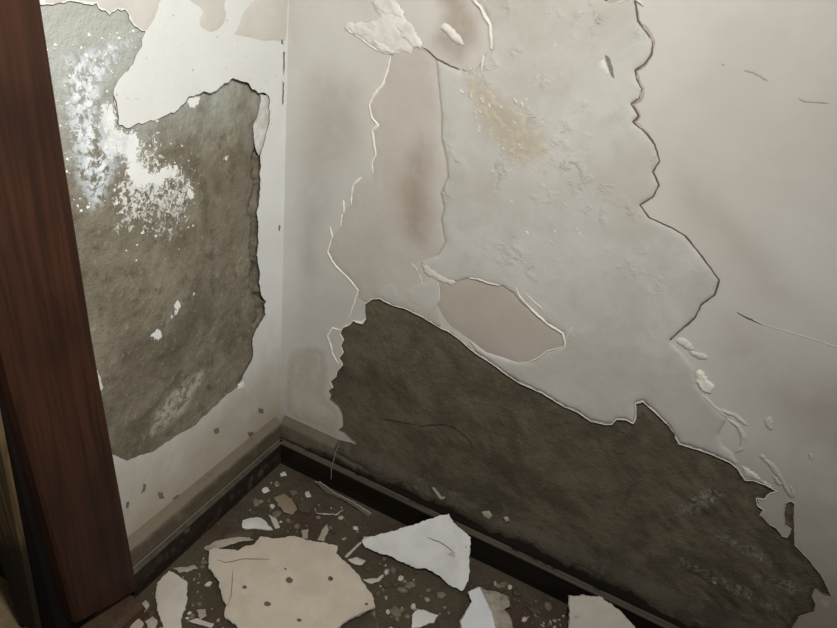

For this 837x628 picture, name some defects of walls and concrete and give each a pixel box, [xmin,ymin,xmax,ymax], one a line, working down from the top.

leakage [63,42,129,206]
peeling [235,0,288,105]
spalling [40,0,270,461]
spalling [329,0,833,628]
crack [736,311,837,348]